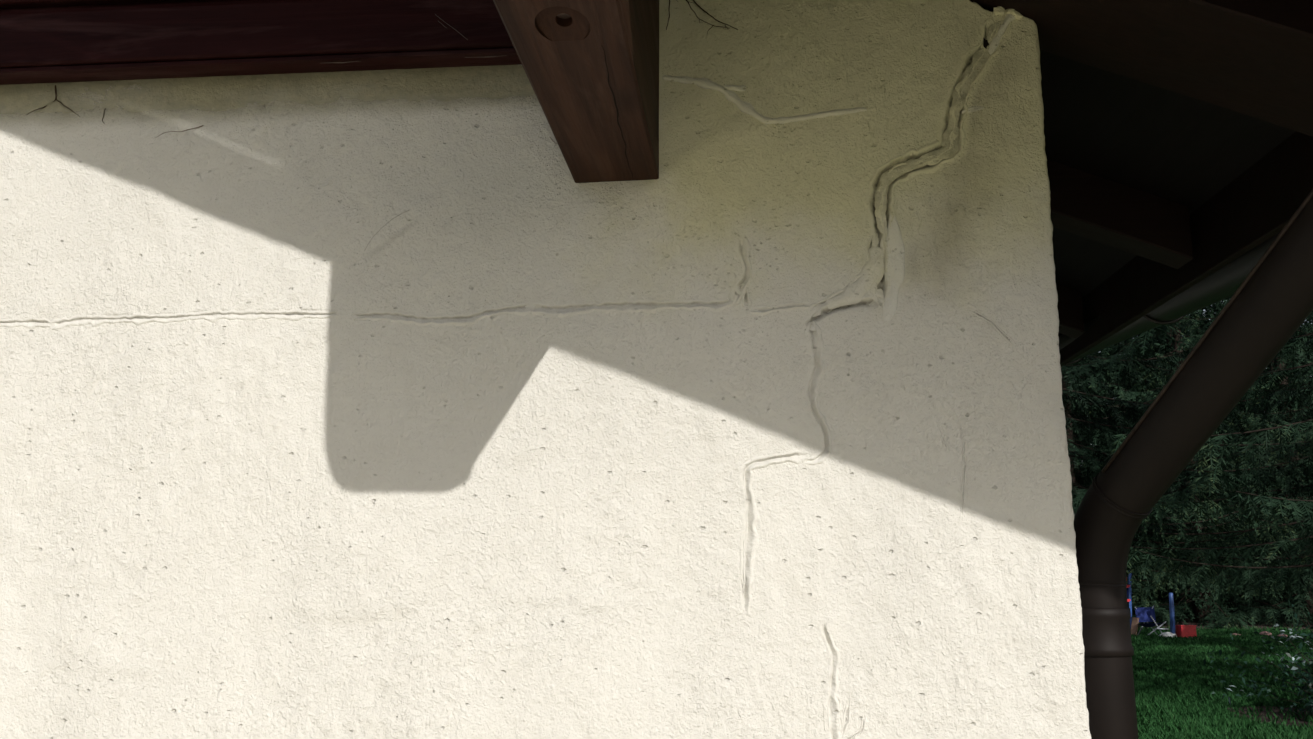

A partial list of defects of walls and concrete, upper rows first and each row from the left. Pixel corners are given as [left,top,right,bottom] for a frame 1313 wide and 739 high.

crack [0,13,1016,615]
crack [817,620,867,739]